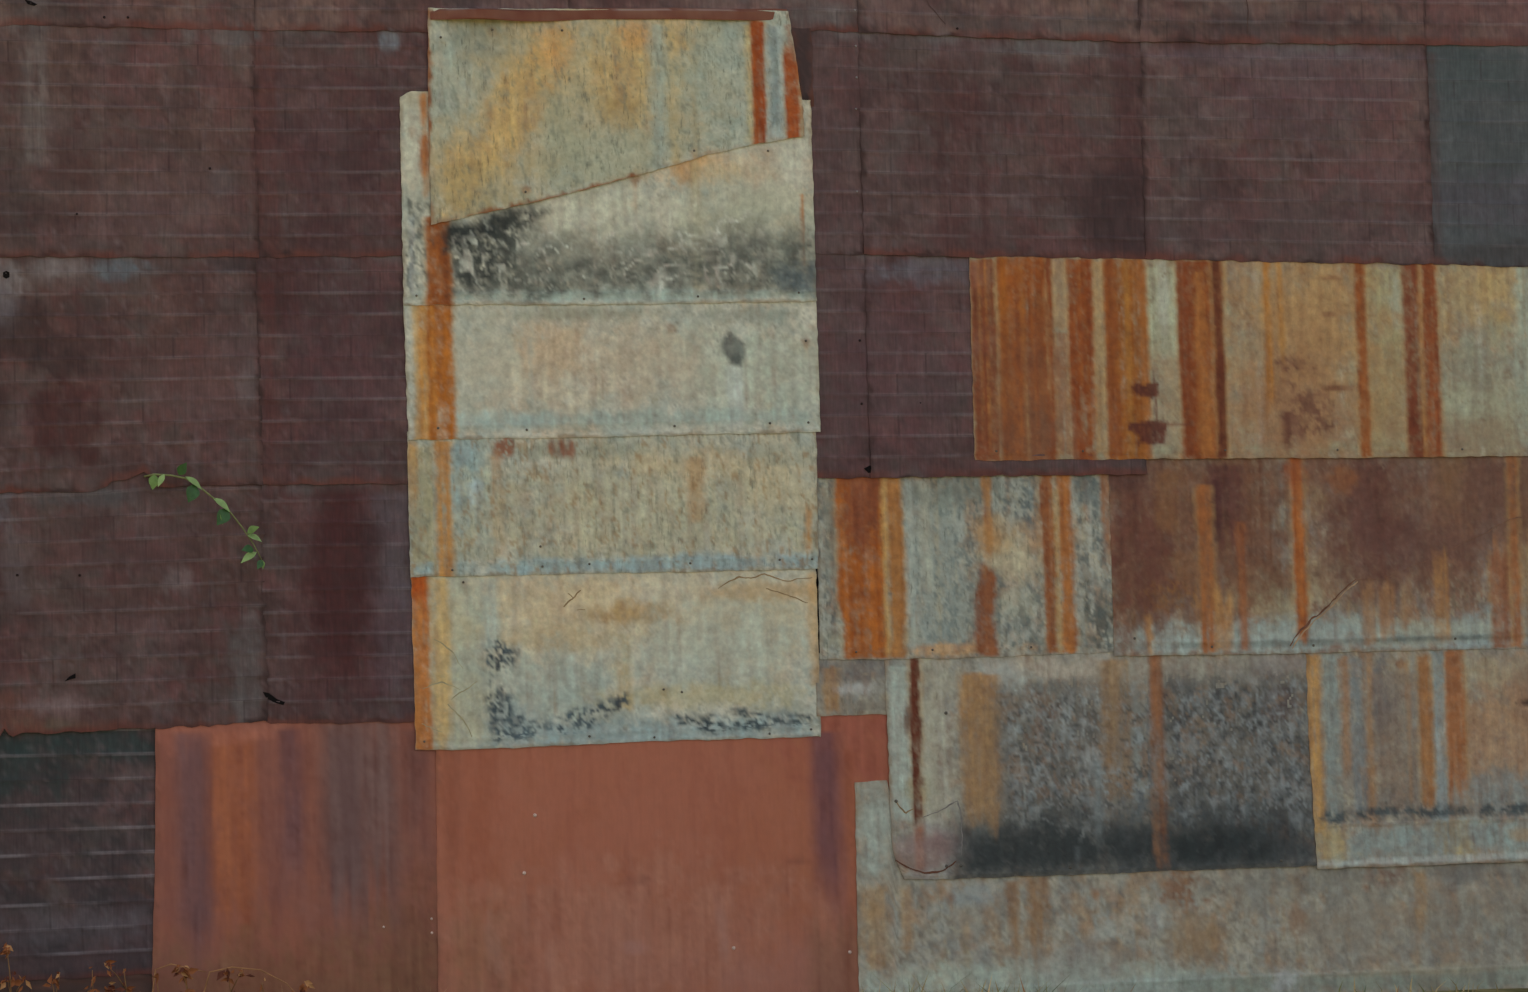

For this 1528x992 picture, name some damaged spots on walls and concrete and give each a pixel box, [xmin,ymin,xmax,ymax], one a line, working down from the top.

rust [743,20,804,146]
rust [407,225,464,750]
rust [488,438,520,511]
rust [545,438,579,463]
mould [480,630,634,749]
rust [802,477,941,879]
rust [954,256,1528,979]